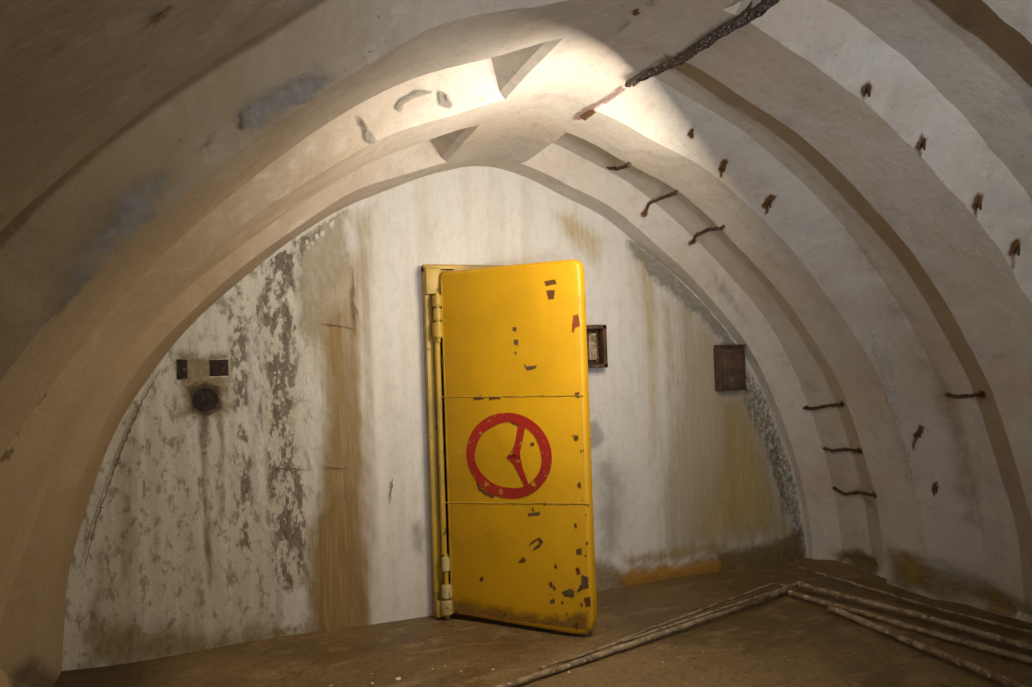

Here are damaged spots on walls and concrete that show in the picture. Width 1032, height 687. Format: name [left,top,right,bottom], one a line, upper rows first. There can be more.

flaking render [360,118,376,144]
peeling [396,91,453,111]
damp [246,269,368,643]
damp [629,242,806,571]